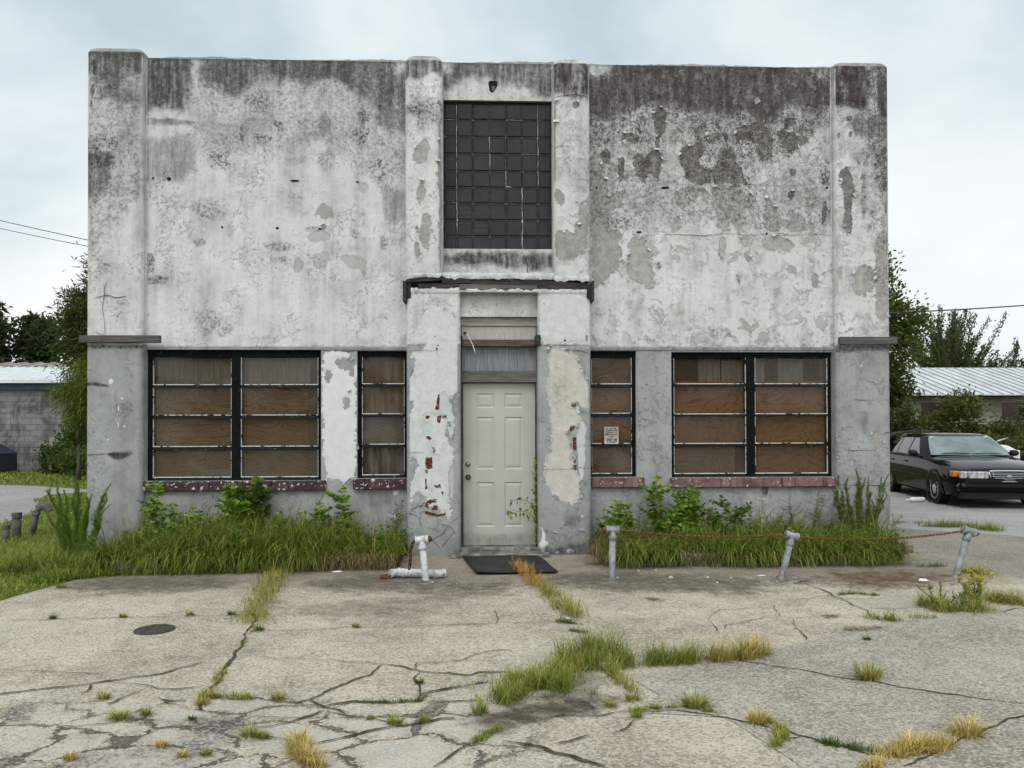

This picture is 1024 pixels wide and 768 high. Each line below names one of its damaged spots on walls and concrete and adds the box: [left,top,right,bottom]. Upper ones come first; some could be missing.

water stain [88,51,888,227]
water stain [444,250,552,273]
peeling [393,97,809,525]
peeling [815,202,830,234]
peeling [826,164,856,234]
peeling [837,230,890,321]
peeling [321,350,359,485]
crack [708,583,885,640]
crack [0,614,511,766]
crack [433,710,636,767]
crack [661,660,1024,766]